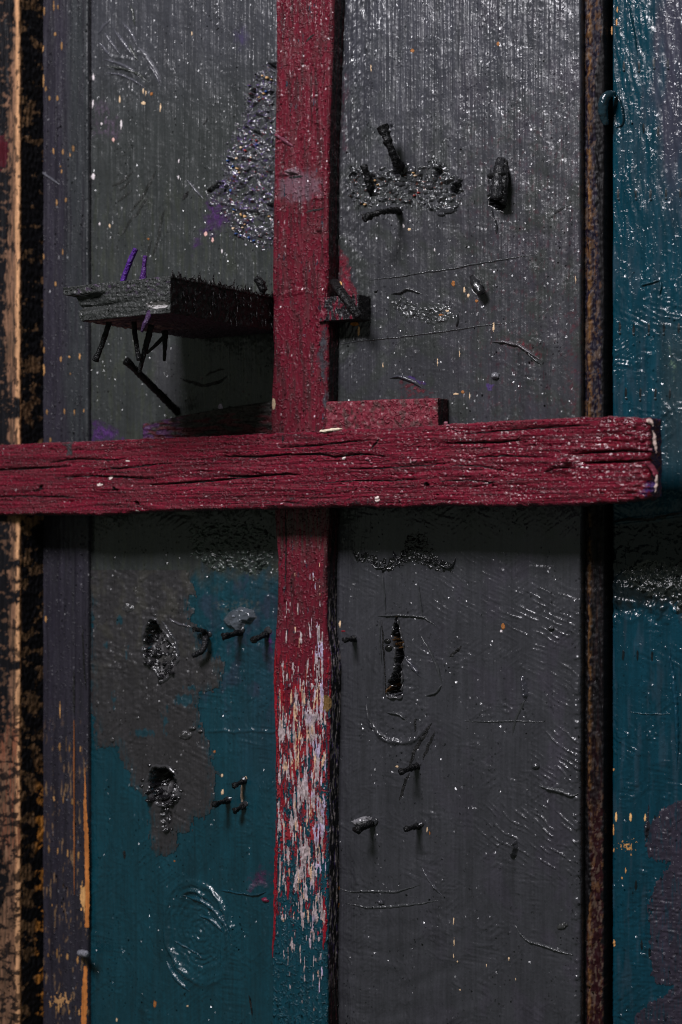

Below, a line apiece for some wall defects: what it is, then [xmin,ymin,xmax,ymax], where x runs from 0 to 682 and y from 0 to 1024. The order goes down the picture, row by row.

crack [0,425,655,499]
peeling [272,601,339,1011]